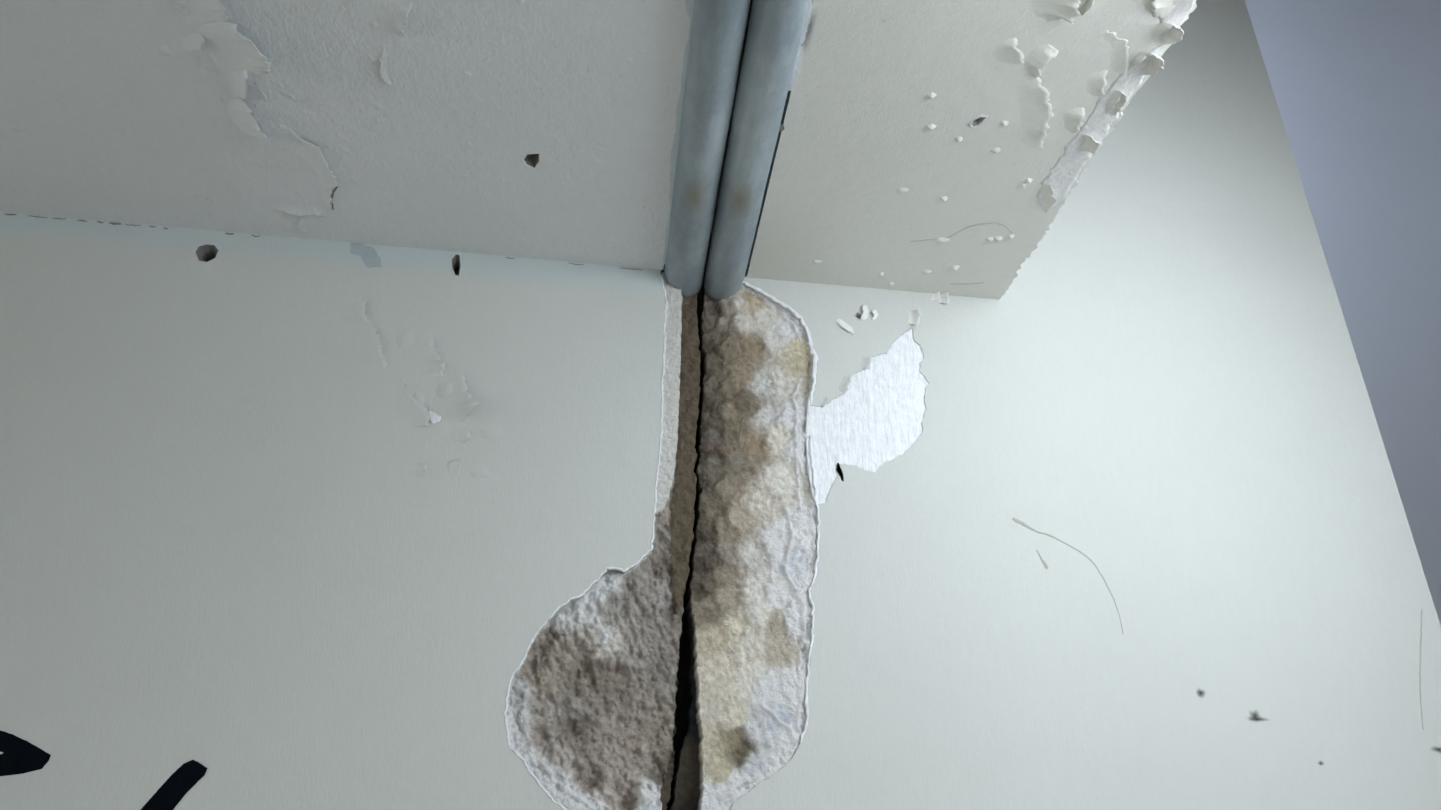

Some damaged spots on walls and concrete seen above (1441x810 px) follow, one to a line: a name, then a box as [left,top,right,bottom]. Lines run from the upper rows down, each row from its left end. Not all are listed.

peeling [179,0,337,207]
peeling [995,0,1196,215]
crack [666,324,702,810]
spalling [504,272,949,810]